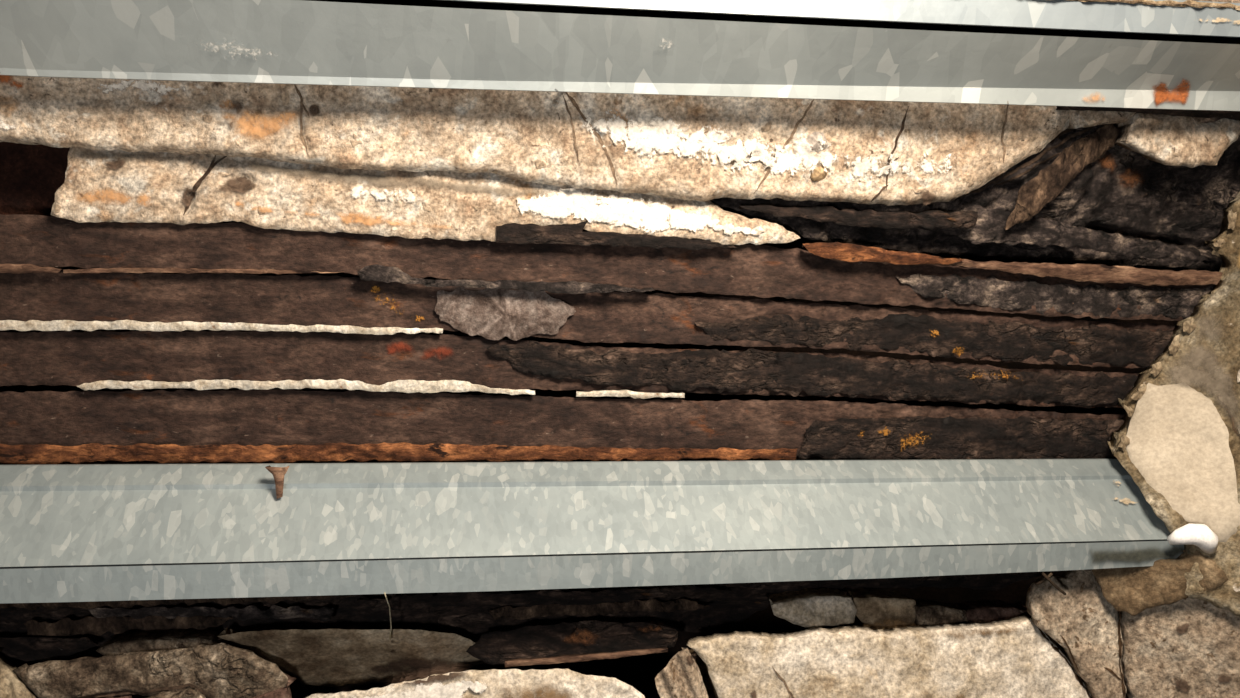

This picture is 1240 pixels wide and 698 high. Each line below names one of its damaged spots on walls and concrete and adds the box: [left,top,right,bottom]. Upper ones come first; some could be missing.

crack [1090,0,1235,8]
peeling [98,79,185,94]
spalling [106,159,125,170]
peeling [582,109,967,205]
spalling [218,172,254,193]
spalling [181,188,195,207]
peeling [348,184,416,203]
peeling [517,188,765,236]
spalling [1123,318,1198,417]
spalling [1117,435,1130,453]